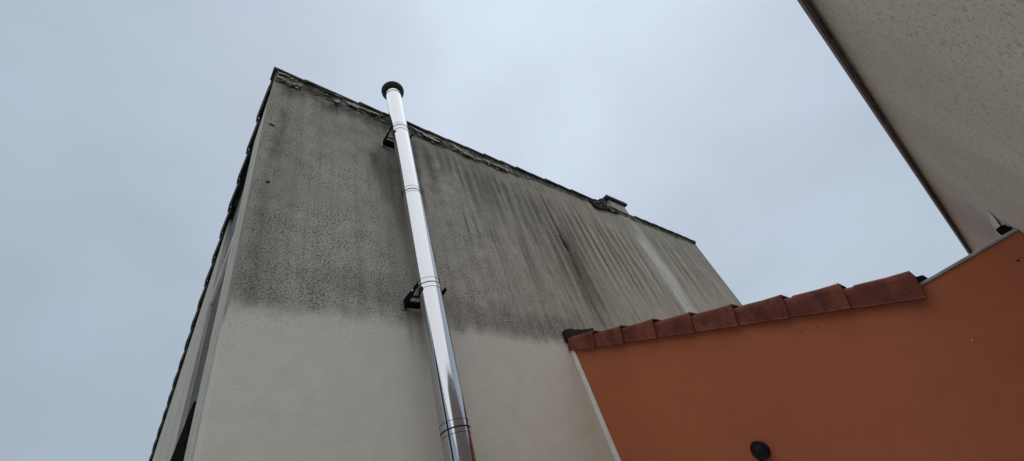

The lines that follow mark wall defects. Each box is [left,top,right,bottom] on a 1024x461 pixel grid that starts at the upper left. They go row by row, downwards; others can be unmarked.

water stain [634,224,695,313]